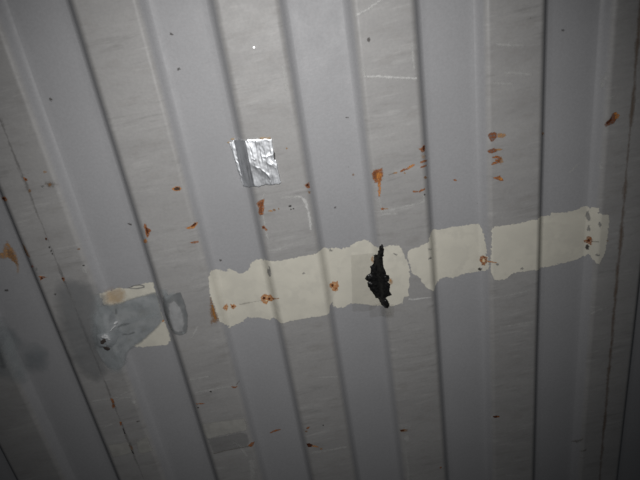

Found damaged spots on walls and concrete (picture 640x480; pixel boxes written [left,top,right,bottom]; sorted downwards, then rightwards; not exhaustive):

corrosion [488,132,505,165]
corrosion [372,168,383,196]
peeling [208,206,610,328]
peeling [100,282,171,348]